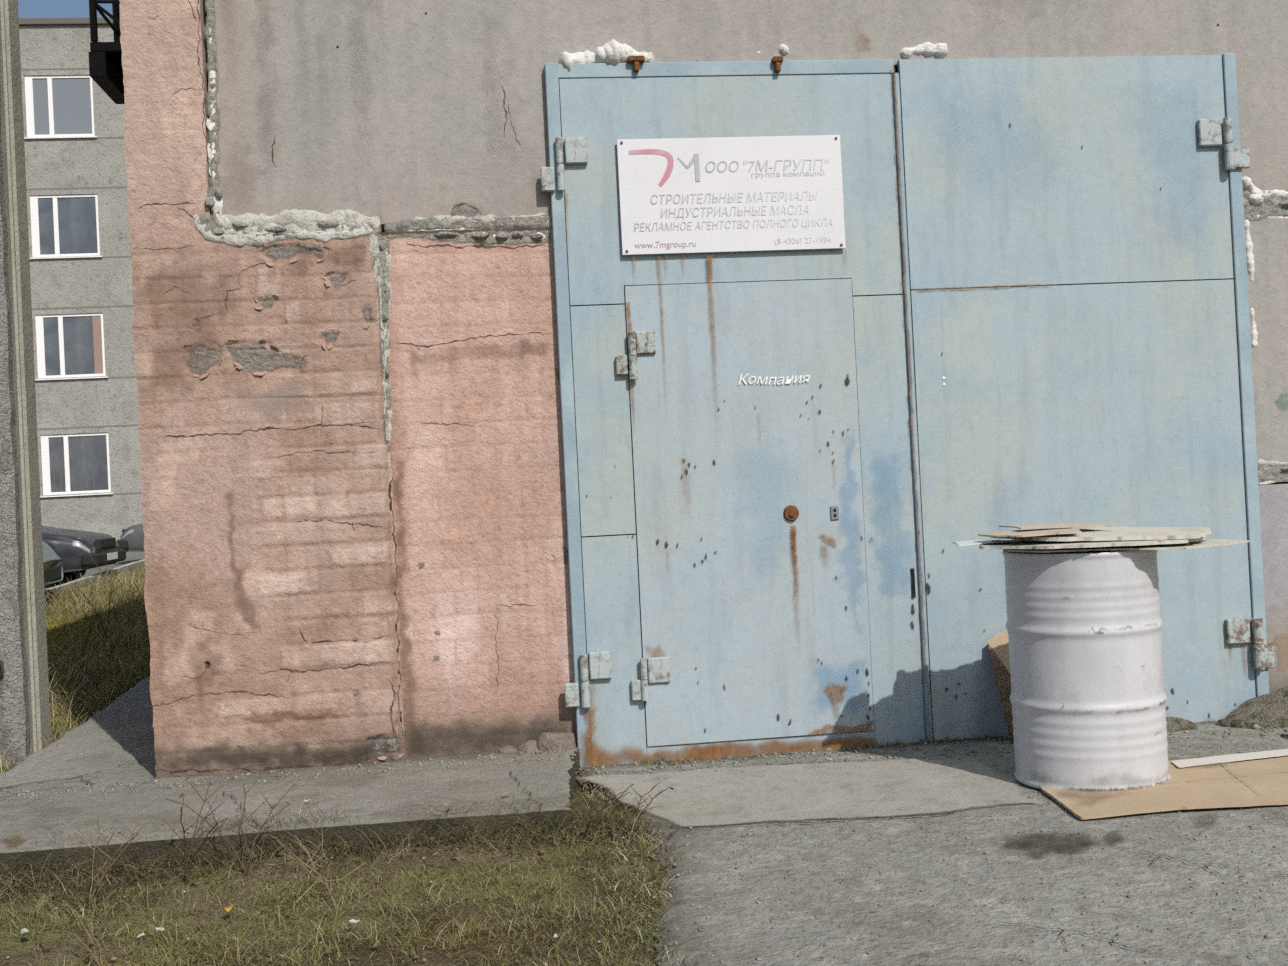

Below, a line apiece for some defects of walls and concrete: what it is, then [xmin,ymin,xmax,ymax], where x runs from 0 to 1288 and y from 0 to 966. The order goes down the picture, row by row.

spalling [263,242,346,287]
spalling [184,317,304,379]
crack [0,407,405,834]
corrosion [826,685,847,703]
corrosion [584,710,875,766]